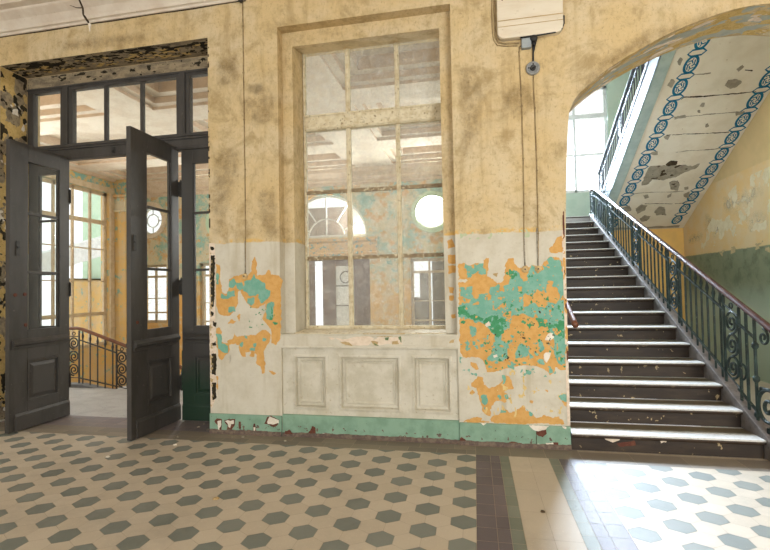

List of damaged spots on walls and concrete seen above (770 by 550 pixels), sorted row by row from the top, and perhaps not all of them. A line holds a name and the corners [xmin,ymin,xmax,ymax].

crack [0,0,246,38]
flaking render [624,161,700,222]
peeling [0,38,209,420]
peeling [209,243,283,408]
peeling [328,333,405,346]
peeling [447,211,570,445]
peeling [215,416,365,434]